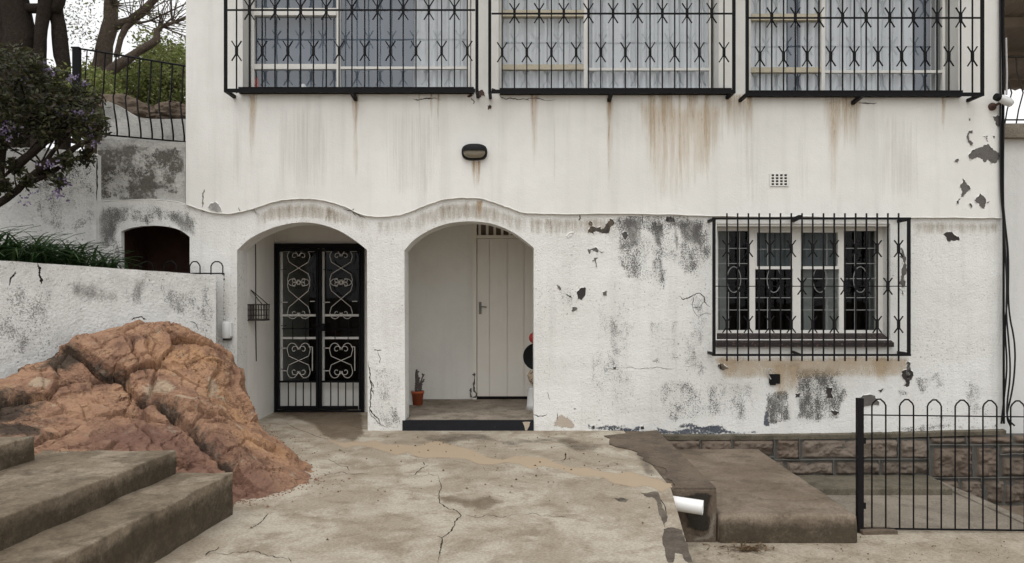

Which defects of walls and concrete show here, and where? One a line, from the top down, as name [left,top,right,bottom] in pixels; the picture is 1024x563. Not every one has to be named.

peeling [954,115,999,164]
water stain [36,145,194,262]
peeling [956,179,989,209]
peeling [588,218,628,267]
water stain [613,216,711,286]
peeling [557,285,587,312]
crack [368,350,396,428]
flaking render [554,408,576,428]
water stain [657,367,847,434]
corrosion [720,358,905,376]
crack [405,454,497,560]